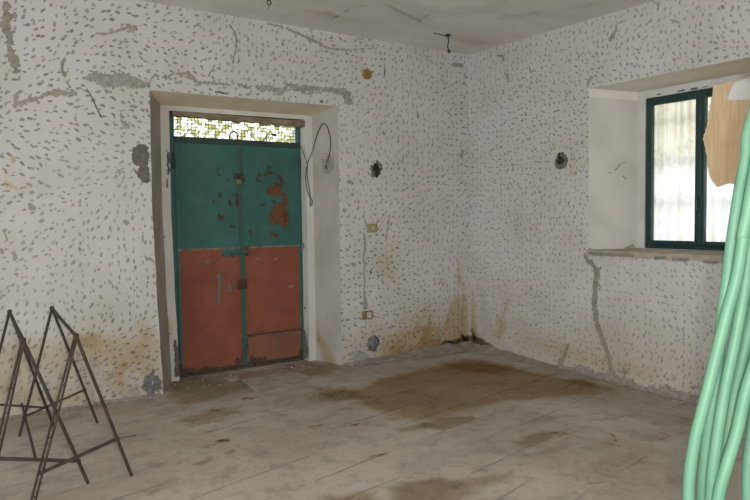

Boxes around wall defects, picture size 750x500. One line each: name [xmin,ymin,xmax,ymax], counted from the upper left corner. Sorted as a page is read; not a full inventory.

peeling [135,161,151,183]
rust [255,165,290,237]
damp [442,334,489,345]
crack [584,248,614,372]